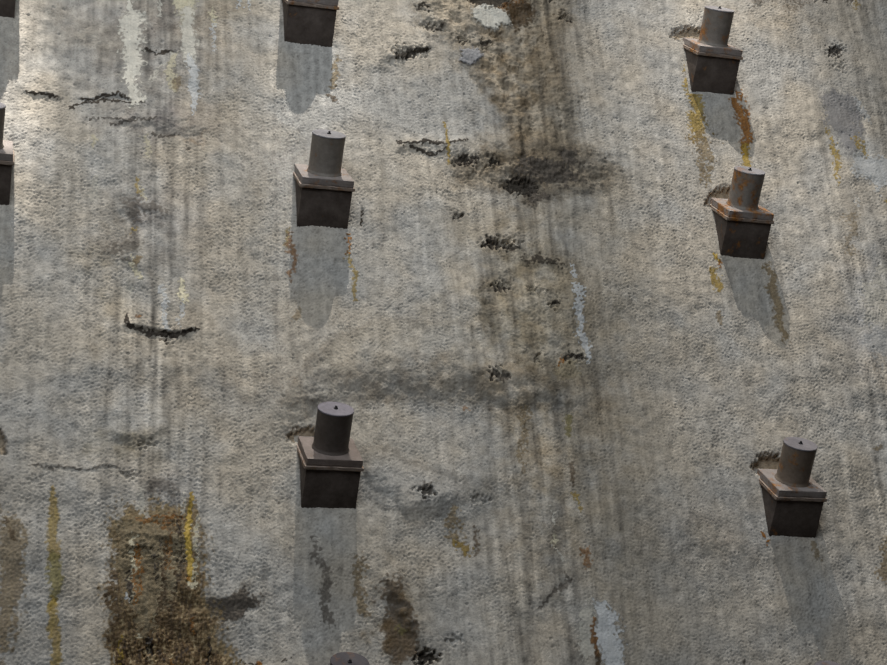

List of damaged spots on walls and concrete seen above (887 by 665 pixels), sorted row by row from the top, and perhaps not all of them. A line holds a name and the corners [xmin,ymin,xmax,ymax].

spalling [395,47,431,61]
crack [25,90,145,109]
spalling [414,0,618,205]
rust [682,65,714,188]
rust [729,89,753,167]
crack [124,313,200,342]